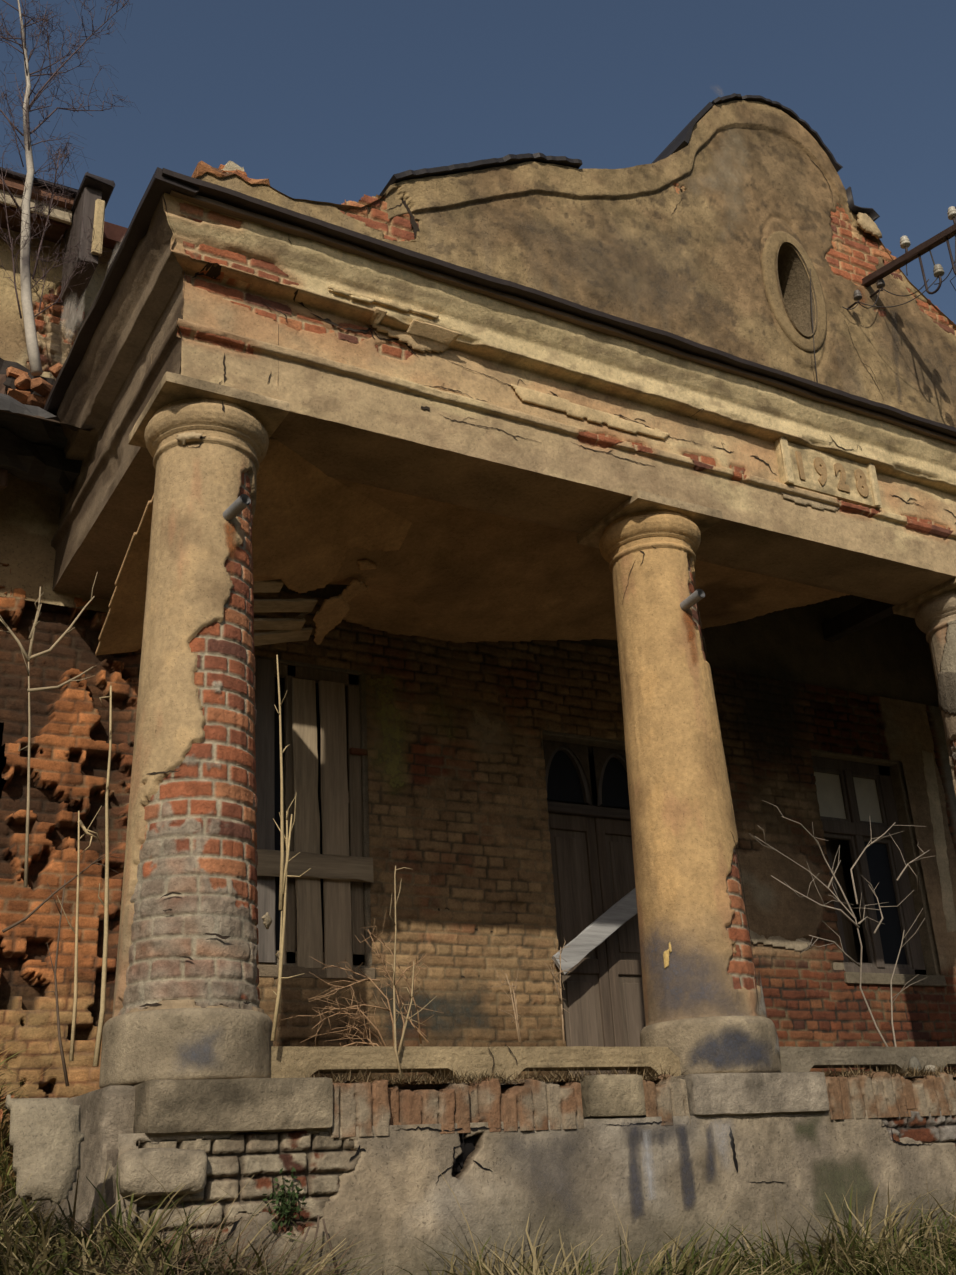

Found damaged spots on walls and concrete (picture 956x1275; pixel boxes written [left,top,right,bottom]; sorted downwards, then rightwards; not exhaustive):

flaking render [328,286,462,353]
crack [265,290,558,443]
flaking render [313,579,369,645]
peeling [937,672,956,715]
flaking render [922,750,956,932]
flaking render [747,926,812,952]
crack [399,1126,520,1183]
damp [630,1127,655,1217]
damp [678,1126,695,1207]